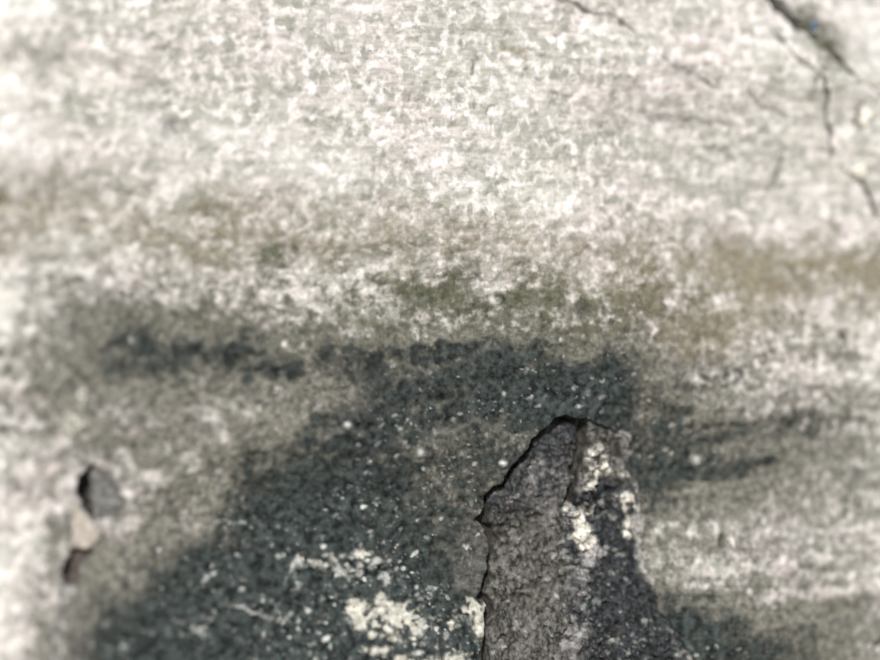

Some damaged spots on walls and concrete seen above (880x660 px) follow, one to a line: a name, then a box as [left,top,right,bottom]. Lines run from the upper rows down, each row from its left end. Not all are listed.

crack [767,0,880,155]
crack [847,163,880,218]
crack [47,462,122,660]
leakage [0,275,880,660]
spalling [452,416,693,660]